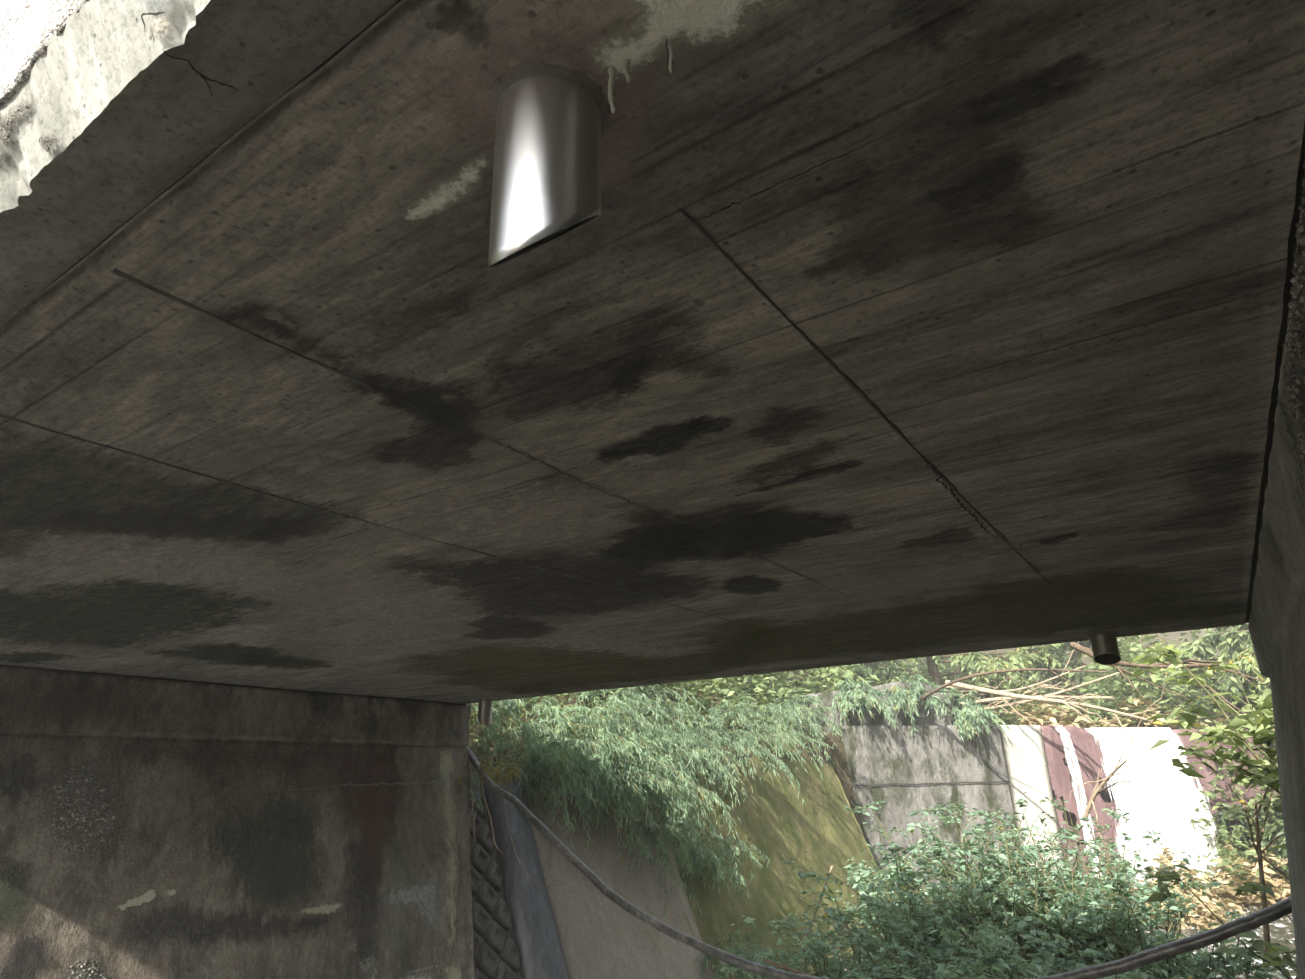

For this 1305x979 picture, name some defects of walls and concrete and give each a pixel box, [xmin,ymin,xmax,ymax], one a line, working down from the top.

spalling [151,16,170,39]
water stain [446,0,762,189]
water stain [406,159,486,220]
water stain [216,303,484,471]
water stain [490,303,737,420]
water stain [380,407,862,639]
water stain [118,794,388,979]